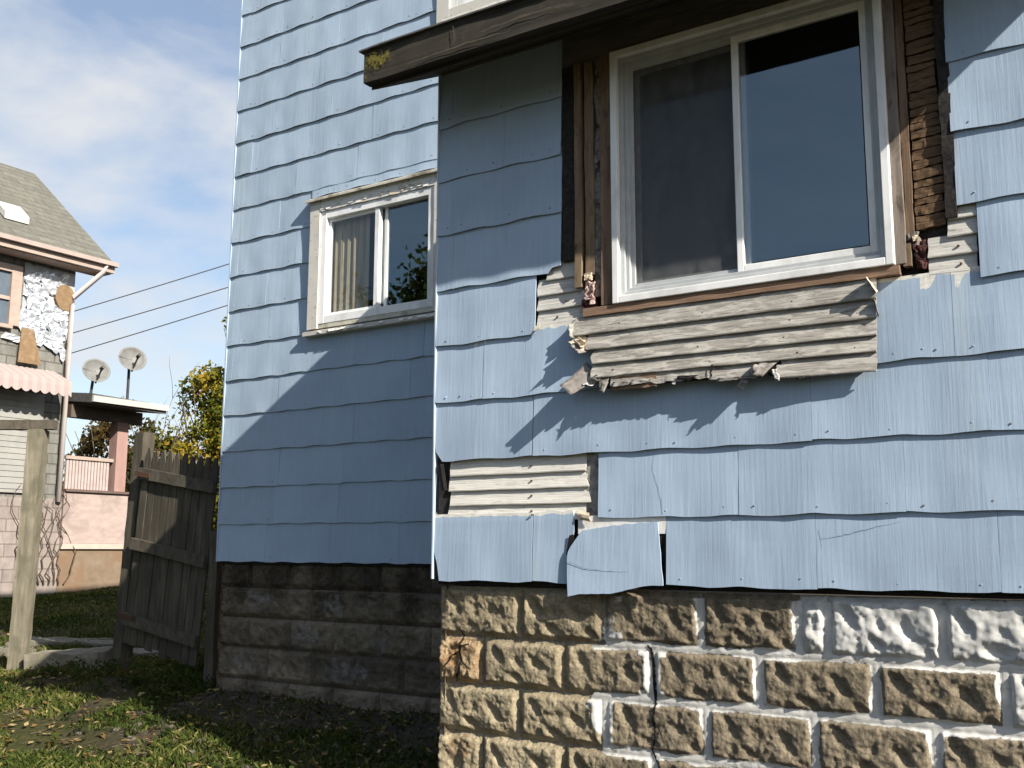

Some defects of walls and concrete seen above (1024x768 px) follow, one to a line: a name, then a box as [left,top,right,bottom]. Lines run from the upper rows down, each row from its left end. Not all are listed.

peeling [19,269,75,348]
peeling [587,374,608,392]
crack [818,521,900,549]
crack [444,626,472,681]
crack [647,645,665,768]